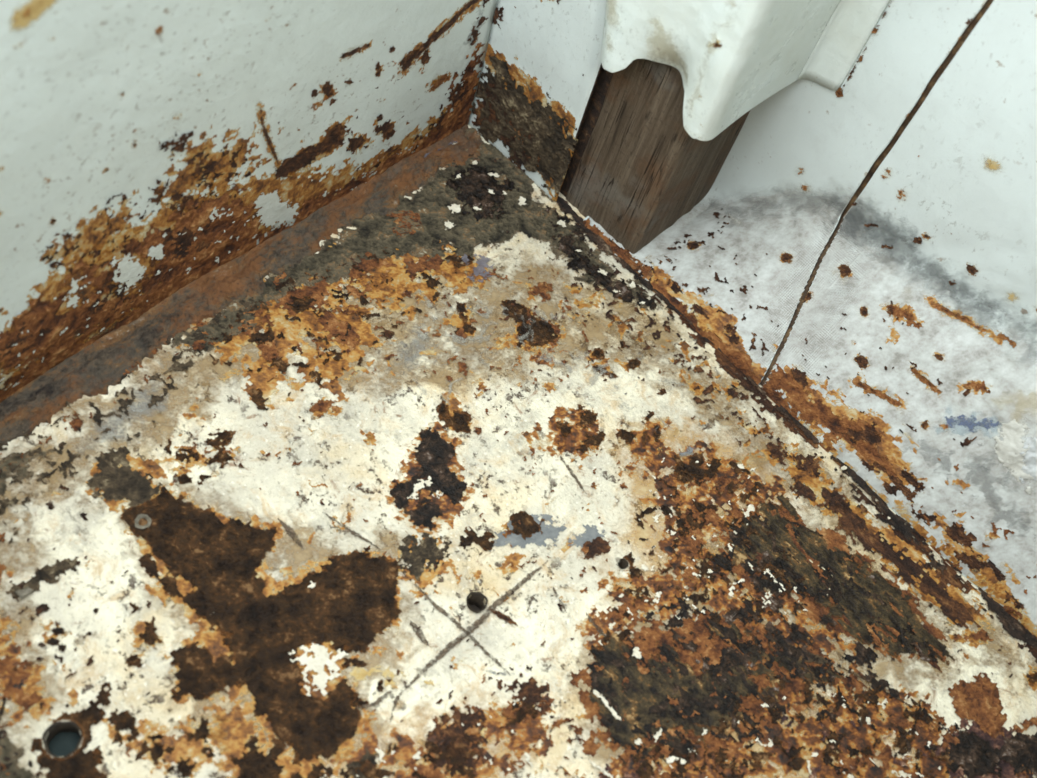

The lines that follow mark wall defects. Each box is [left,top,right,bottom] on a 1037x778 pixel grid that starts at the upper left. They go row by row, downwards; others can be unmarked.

corrosion [0,0,578,403]
spalling [500,299,567,369]
spalling [0,615,112,778]
spalling [120,421,527,778]
corrosion [0,208,1037,778]
spalling [668,447,719,491]
spalling [570,596,905,778]
spalling [717,493,955,673]
spalling [930,718,1037,778]
peeling [993,418,1037,494]